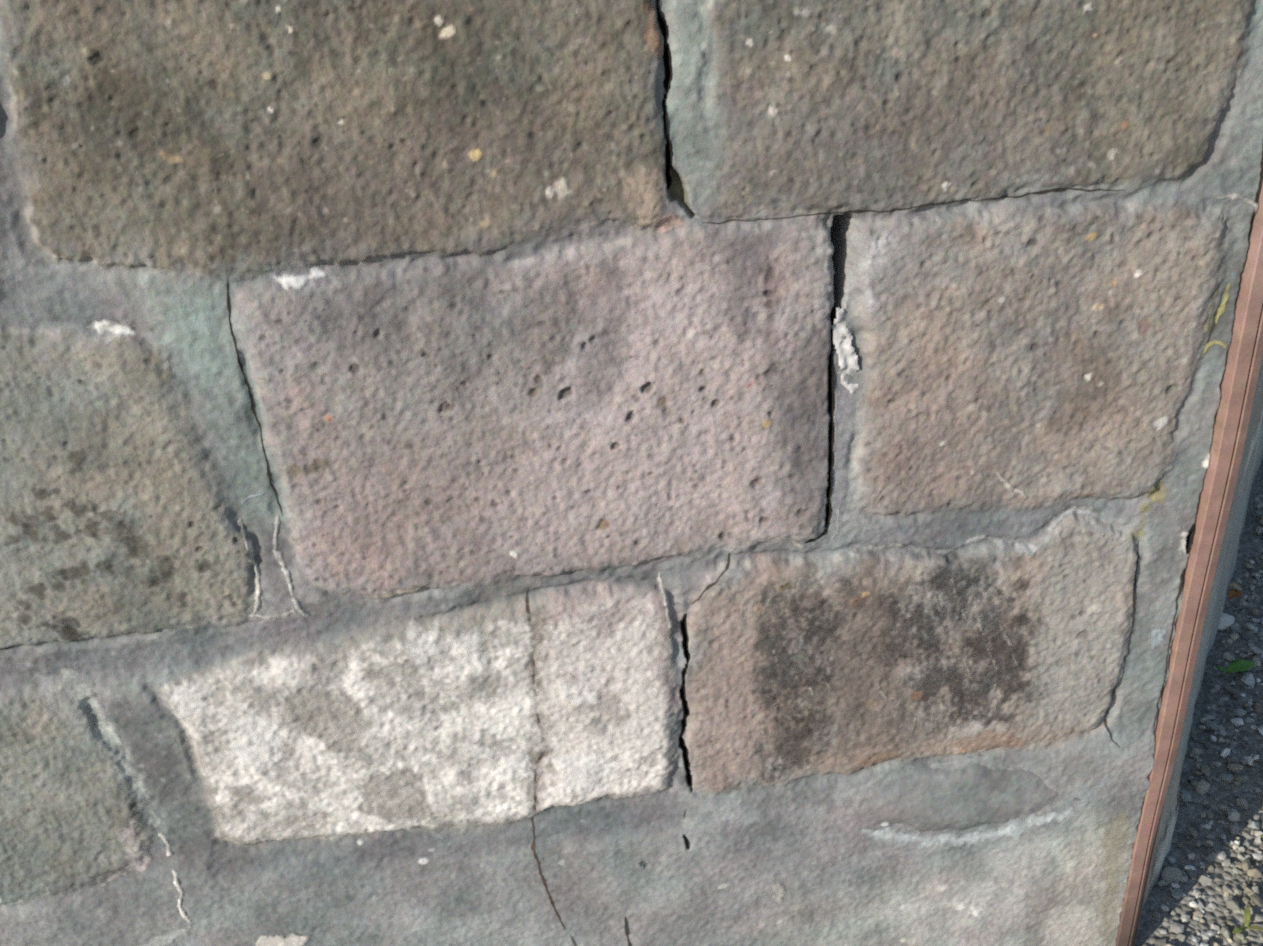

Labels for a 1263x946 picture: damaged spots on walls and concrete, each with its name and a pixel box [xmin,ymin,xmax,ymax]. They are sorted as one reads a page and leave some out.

crack [656,0,672,189]
crack [227,279,282,514]
crack [805,307,835,543]
crack [525,589,576,946]
crack [679,554,730,849]
damp [756,594,787,708]
damp [981,578,1033,725]